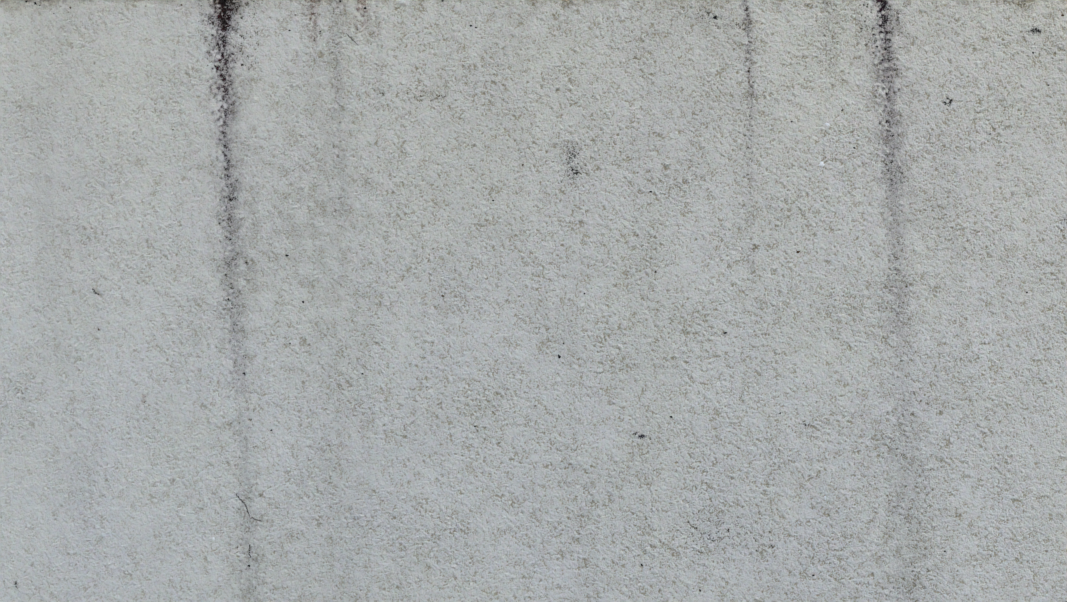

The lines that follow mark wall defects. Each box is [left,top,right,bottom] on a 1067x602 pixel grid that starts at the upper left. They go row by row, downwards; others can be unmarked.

leakage [198,0,258,200]
leakage [860,0,907,99]